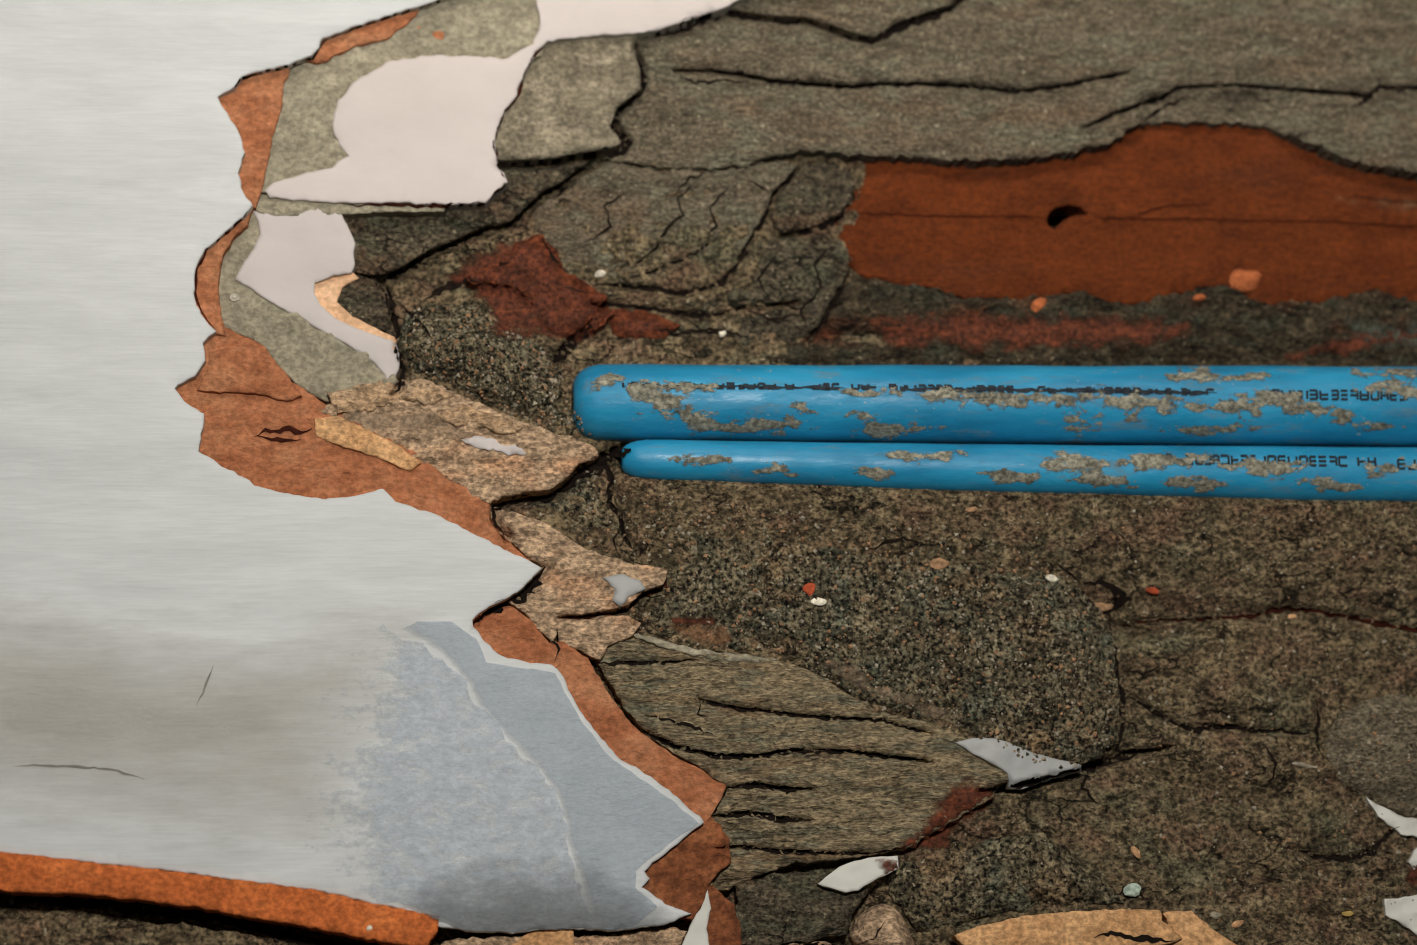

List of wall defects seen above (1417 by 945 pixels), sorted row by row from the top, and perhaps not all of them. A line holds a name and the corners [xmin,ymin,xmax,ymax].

crack [346,0,1417,395]
peeling [533,160,856,347]
spalling [1229,269,1261,292]
flaking render [176,0,779,945]
spalling [802,583,827,606]
crack [593,658,696,666]
crack [644,699,931,856]
peeling [955,738,1081,790]
peeling [1364,797,1417,870]
peeling [817,856,898,894]
flaking render [1123,883,1141,897]
peeling [1382,895,1417,937]